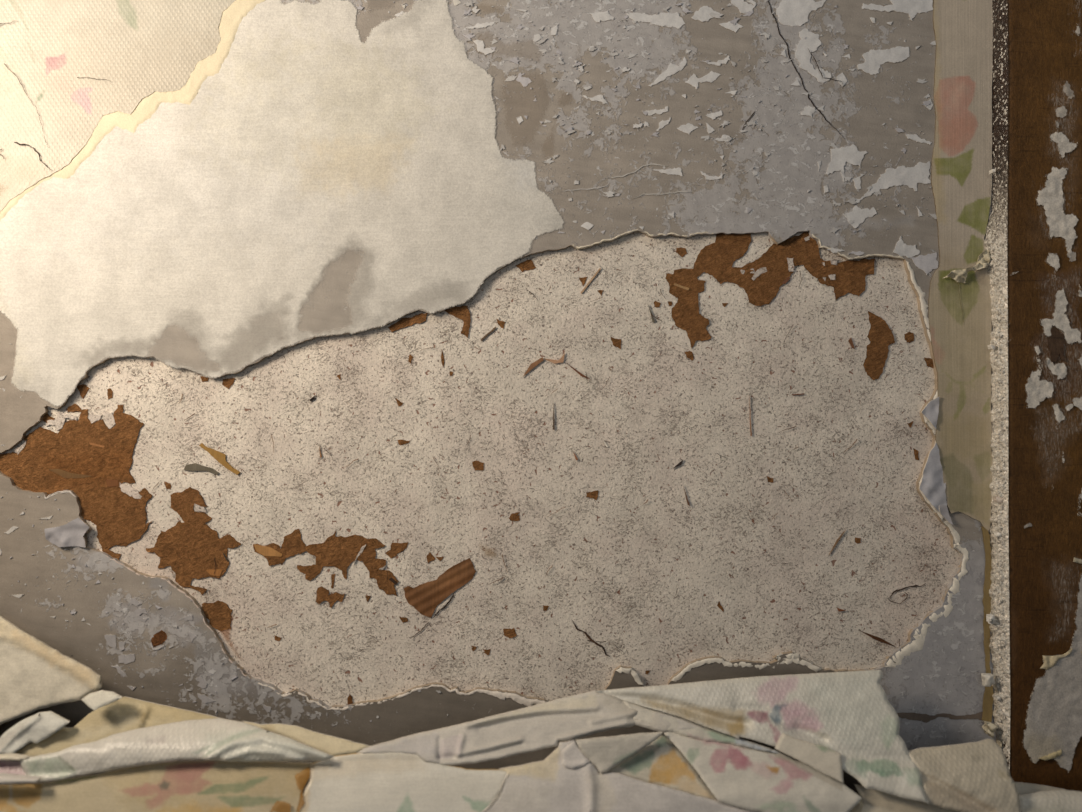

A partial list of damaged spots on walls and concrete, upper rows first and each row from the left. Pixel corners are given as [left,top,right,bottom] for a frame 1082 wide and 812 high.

peeling [627,0,756,33]
peeling [862,0,933,25]
peeling [467,22,498,55]
peeling [776,0,909,87]
peeling [648,50,730,98]
crack [768,1,844,138]
peeling [645,106,734,142]
peeling [906,134,932,145]
peeling [653,167,682,176]
peeling [818,144,931,228]
peeling [1047,325,1065,362]
spalling [0,222,969,710]